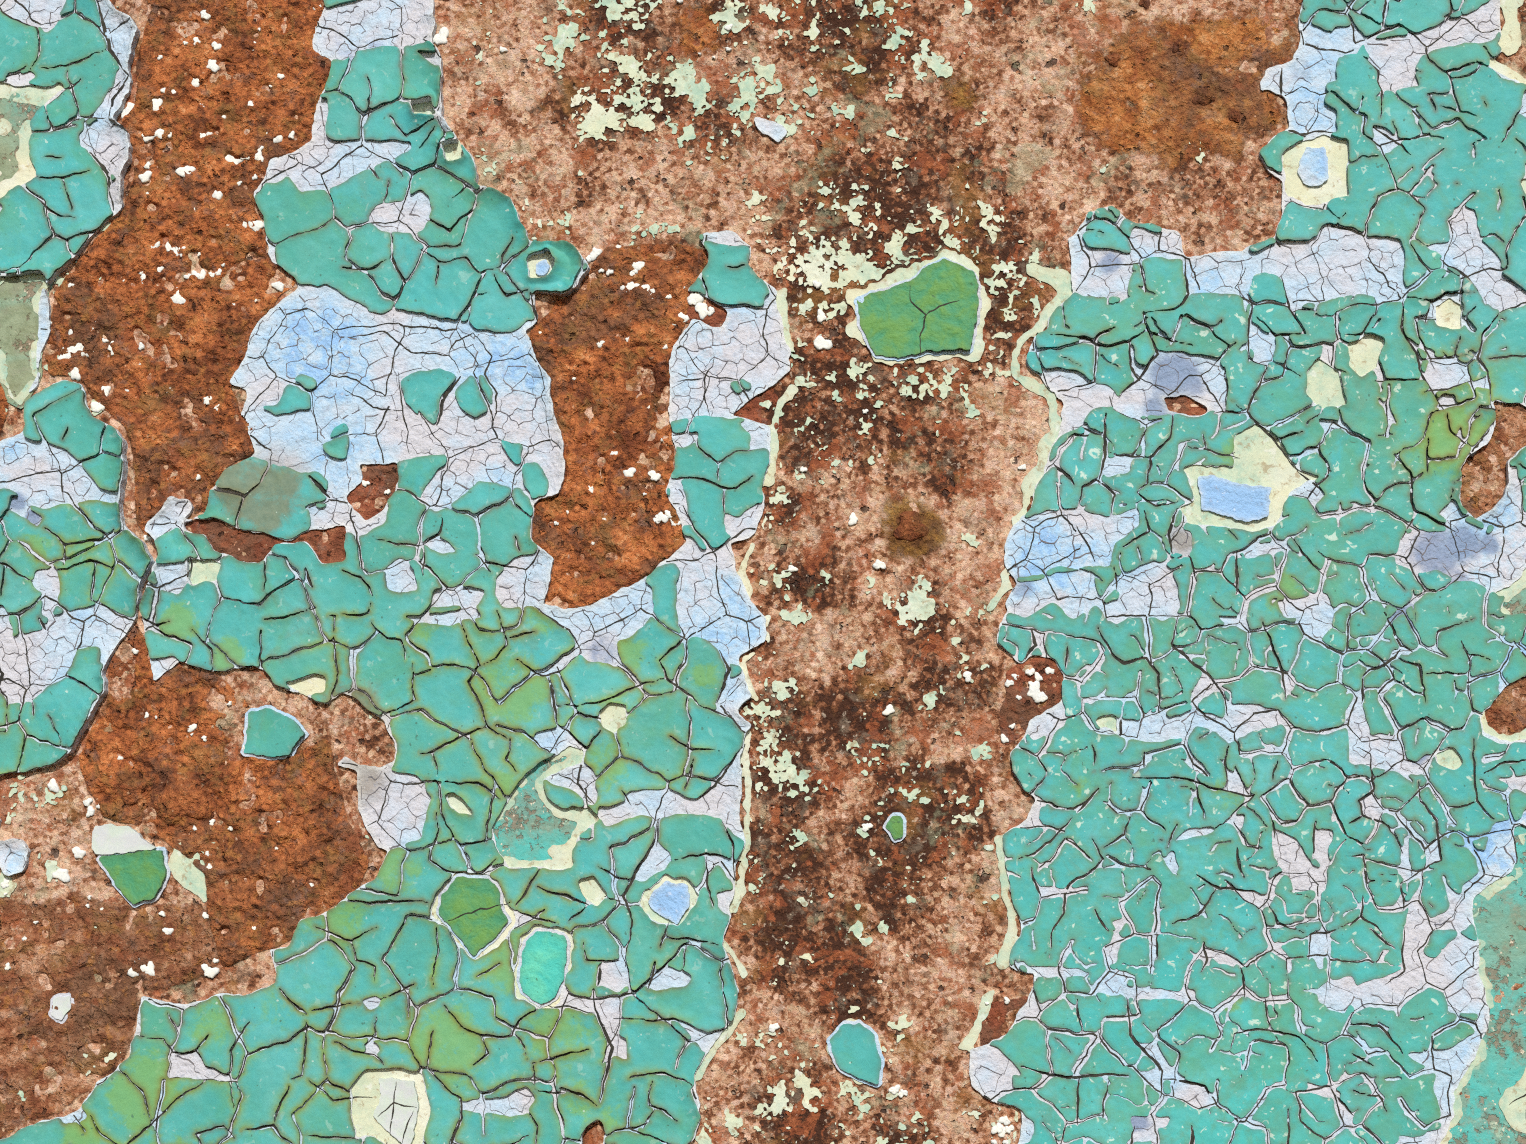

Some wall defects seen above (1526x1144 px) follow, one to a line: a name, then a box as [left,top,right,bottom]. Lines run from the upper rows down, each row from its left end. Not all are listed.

rust [0,627,369,1139]
rust [45,0,346,564]
crack [0,0,791,1144]
peeling [0,0,798,1144]
rust [529,243,727,608]
peeling [826,1018,885,1087]
peeling [845,249,991,366]
crack [910,298,959,355]
rust [999,656,1062,745]
rust [1076,0,1296,171]
peeling [958,0,1526,1144]
crack [983,0,1526,1144]